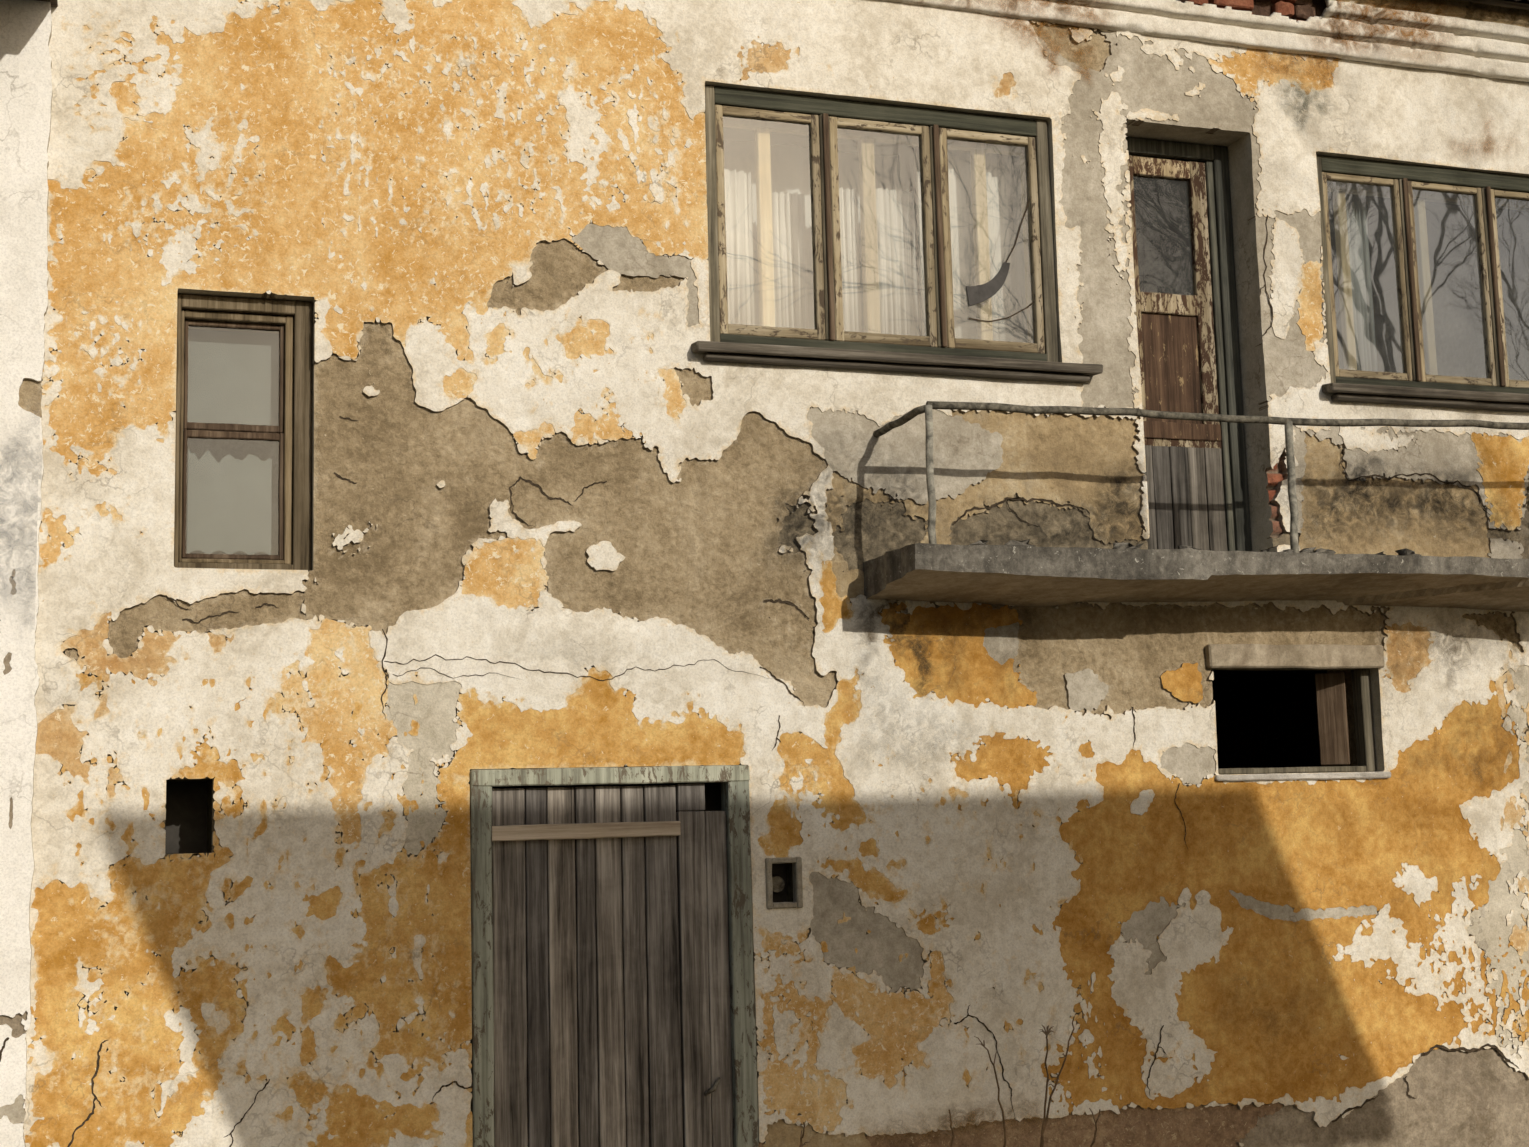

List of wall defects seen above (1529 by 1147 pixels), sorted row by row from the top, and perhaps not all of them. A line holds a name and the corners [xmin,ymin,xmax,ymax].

flaking render [1178,0,1327,22]
peeling [1262,209,1326,352]
spalling [1262,425,1529,559]
crack [166,596,278,623]
peeling [0,0,1148,1147]
peeling [754,602,1529,1147]
crack [0,1037,9,1061]
crack [67,1040,108,1147]